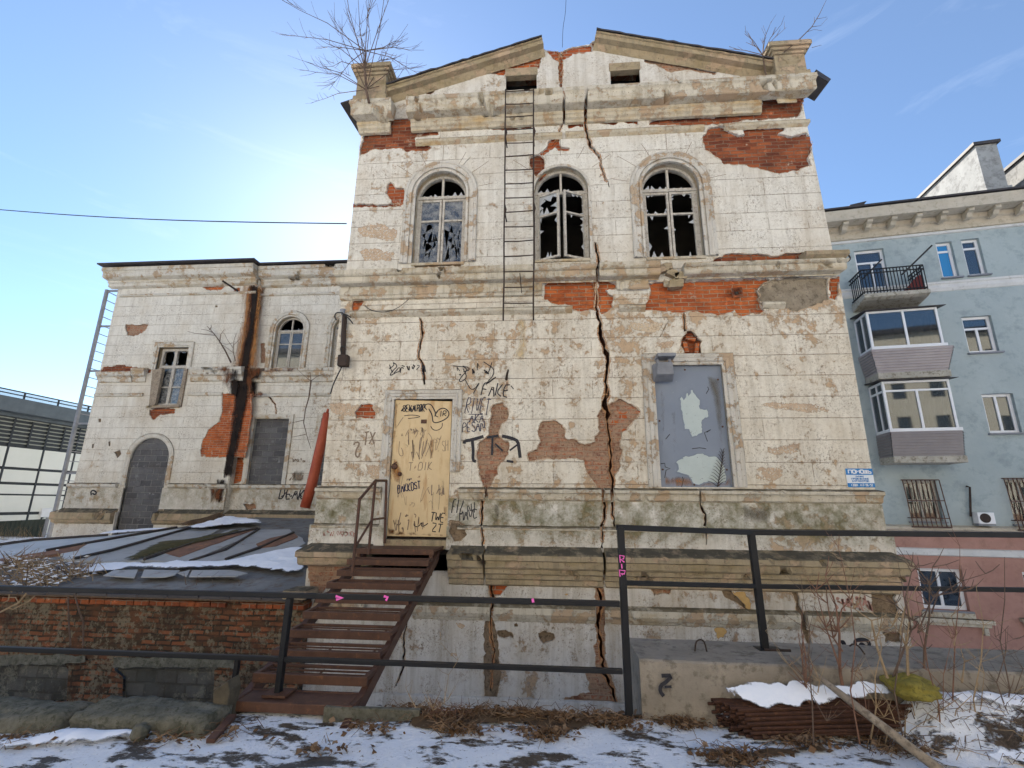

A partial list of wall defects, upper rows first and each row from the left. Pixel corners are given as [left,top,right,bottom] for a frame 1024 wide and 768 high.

flaking render [359,119,439,155]
crack [552,51,608,183]
flaking render [599,98,813,173]
flaking render [200,393,252,484]
rust [217,285,263,387]
crack [417,318,426,385]
flaking render [543,280,616,314]
flaking render [526,398,641,498]
crack [593,245,616,548]
flaking render [646,276,840,316]
crack [478,500,486,546]
crack [596,588,617,702]